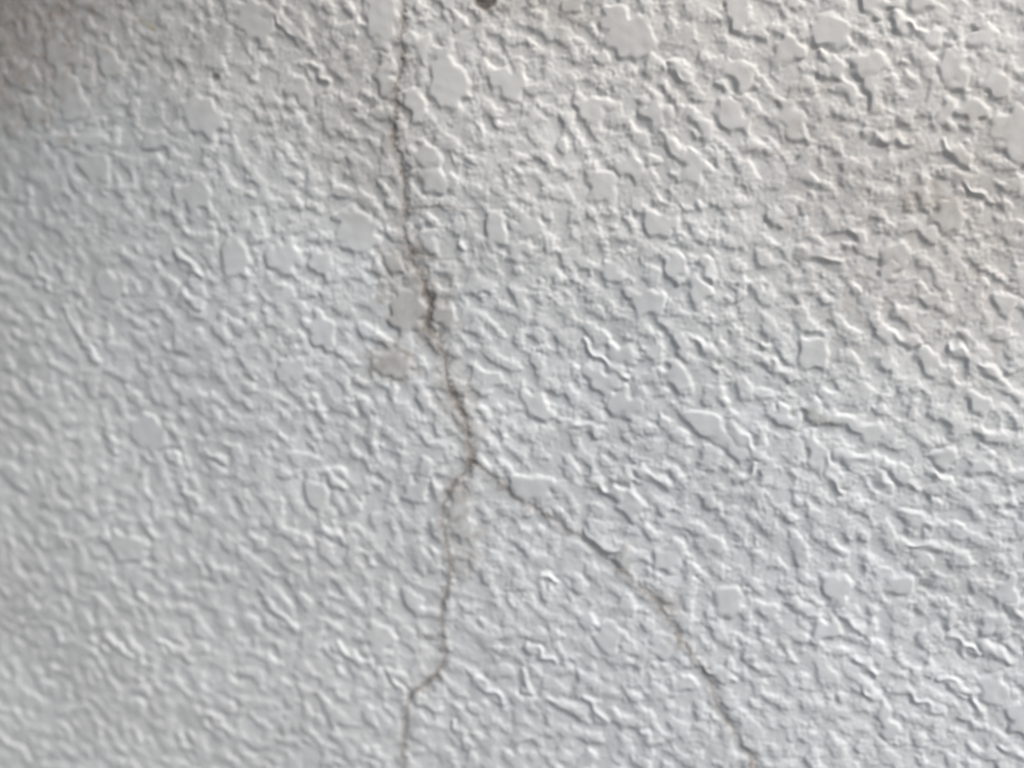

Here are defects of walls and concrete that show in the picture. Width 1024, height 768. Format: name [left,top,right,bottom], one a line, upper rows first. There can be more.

crack [391,81,407,211]
crack [423,281,439,339]
crack [446,376,465,422]